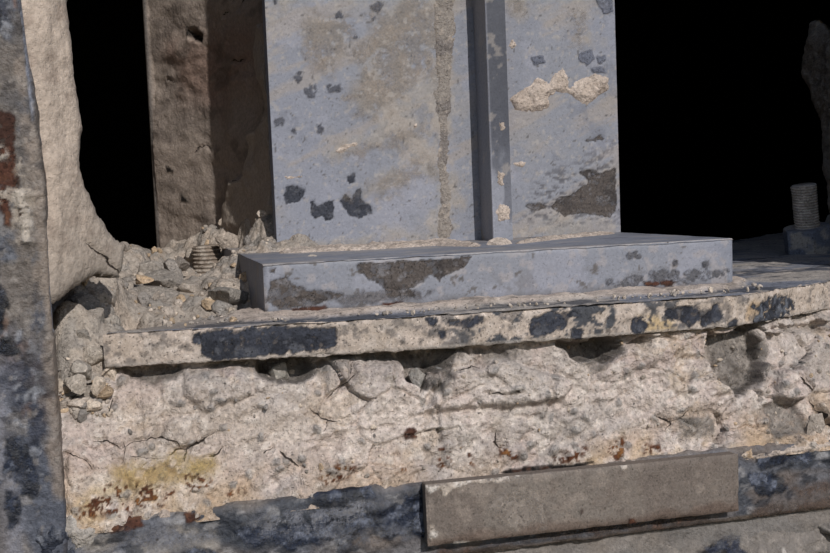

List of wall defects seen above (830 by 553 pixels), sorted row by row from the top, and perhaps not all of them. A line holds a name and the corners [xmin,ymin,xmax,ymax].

rust [0,110,22,226]
peeling [526,168,617,217]
peeling [425,315,484,339]
peeling [193,325,338,383]
spalling [410,347,464,391]
crack [310,365,354,431]
spalling [679,417,714,436]
spalling [764,401,806,438]
crack [67,434,222,469]
crack [264,447,299,467]
peeling [757,450,812,470]
rust [79,483,175,532]